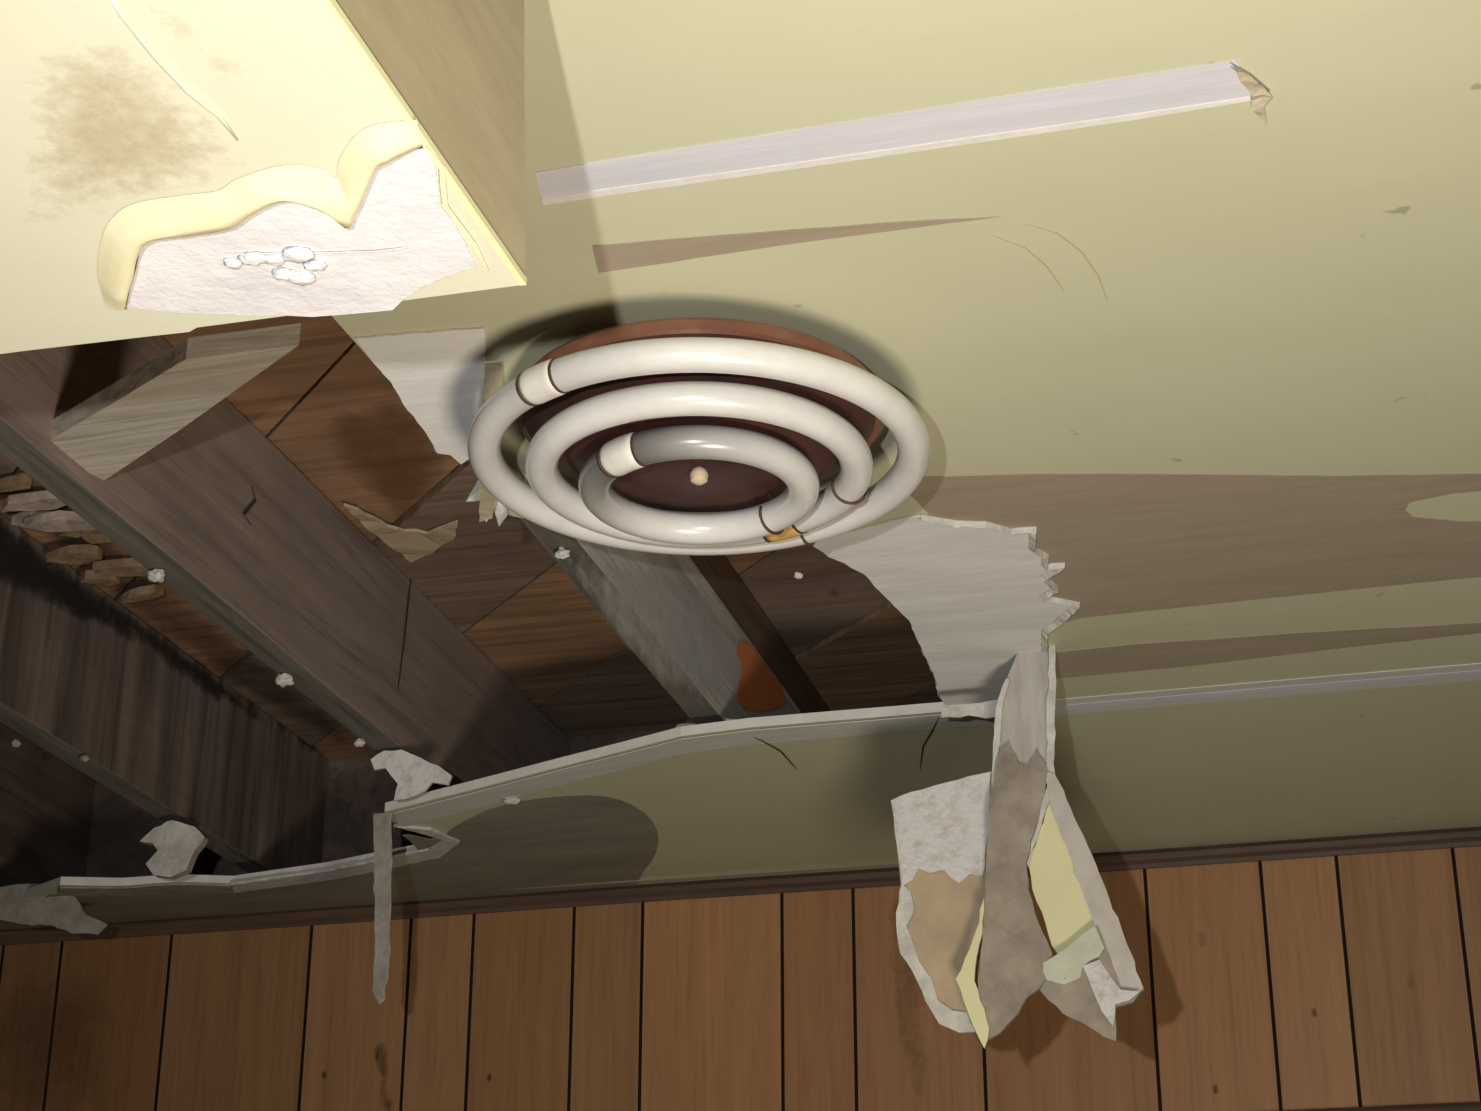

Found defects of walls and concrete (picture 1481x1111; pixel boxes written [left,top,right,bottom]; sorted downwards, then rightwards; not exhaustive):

peeling [97,120,489,317]
flaking render [355,327,503,464]
flaking render [466,480,507,526]
peeling [813,473,1481,705]
corrosion [737,640,785,712]
peeling [58,883,234,897]